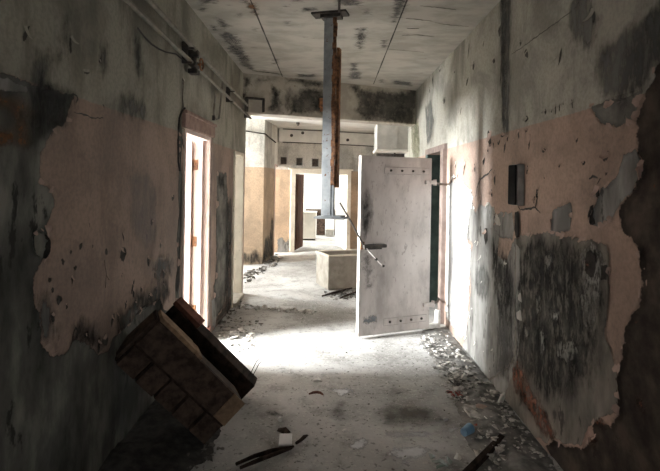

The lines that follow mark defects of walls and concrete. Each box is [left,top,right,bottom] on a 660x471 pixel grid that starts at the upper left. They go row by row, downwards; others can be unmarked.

damp [0,56,70,138]
damp [269,74,323,114]
damp [352,63,416,124]
damp [500,0,511,134]
damp [596,6,660,103]
peeling [0,73,167,471]
flaking render [446,63,660,471]
damp [492,239,603,441]